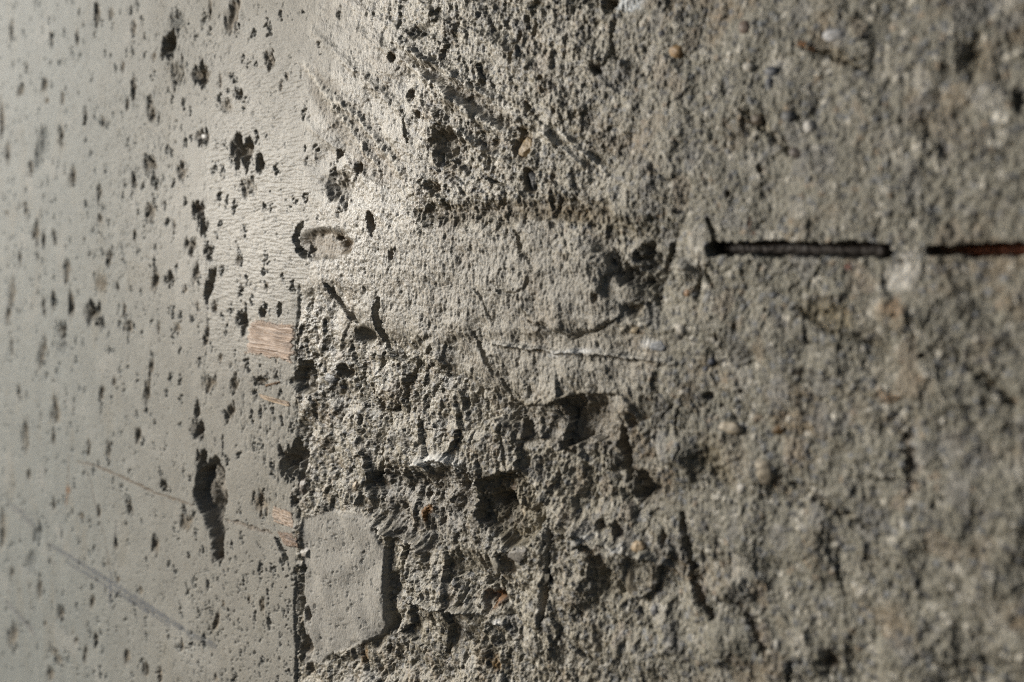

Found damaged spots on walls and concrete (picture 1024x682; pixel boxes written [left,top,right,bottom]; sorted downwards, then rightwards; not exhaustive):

spalling [292,222,354,262]
spalling [319,148,365,212]
spalling [365,208,376,239]
spalling [406,88,677,334]
spalling [289,359,322,398]
spalling [335,323,379,380]
spalling [277,435,310,510]
spalling [510,397,665,510]
spalling [687,430,742,489]
spalling [371,453,551,629]
spalling [579,517,637,615]
spalling [657,528,669,548]